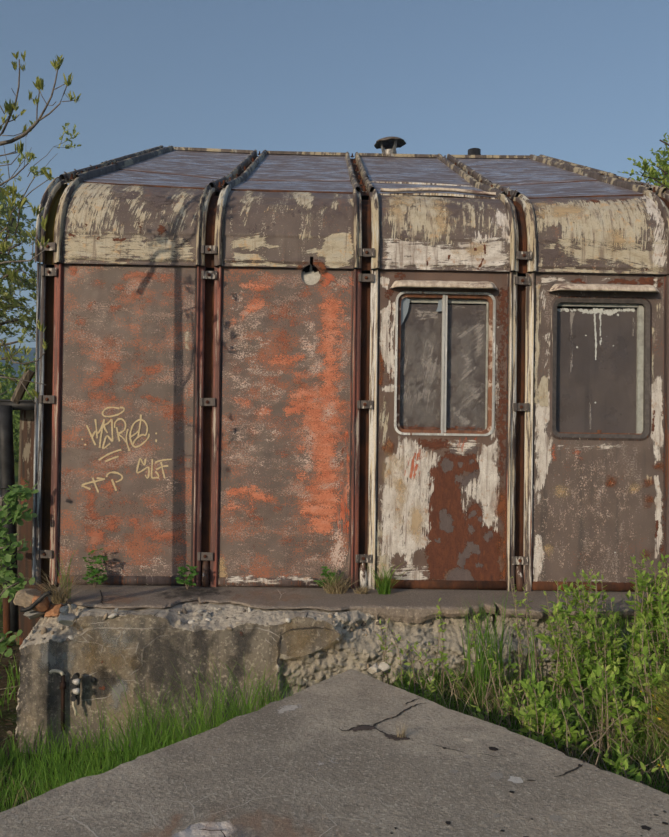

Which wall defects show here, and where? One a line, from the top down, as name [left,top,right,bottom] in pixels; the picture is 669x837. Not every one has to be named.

peeling [380,195,510,290]
peeling [532,195,667,274]
peeling [62,181,197,431]
peeling [219,191,354,585]
peeling [378,300,396,446]
peeling [376,437,439,580]
peeling [444,423,500,532]
peeling [533,283,642,583]
peeling [647,475,663,559]
peeling [650,355,664,465]
spalling [19,602,637,699]
crack [338,698,423,739]